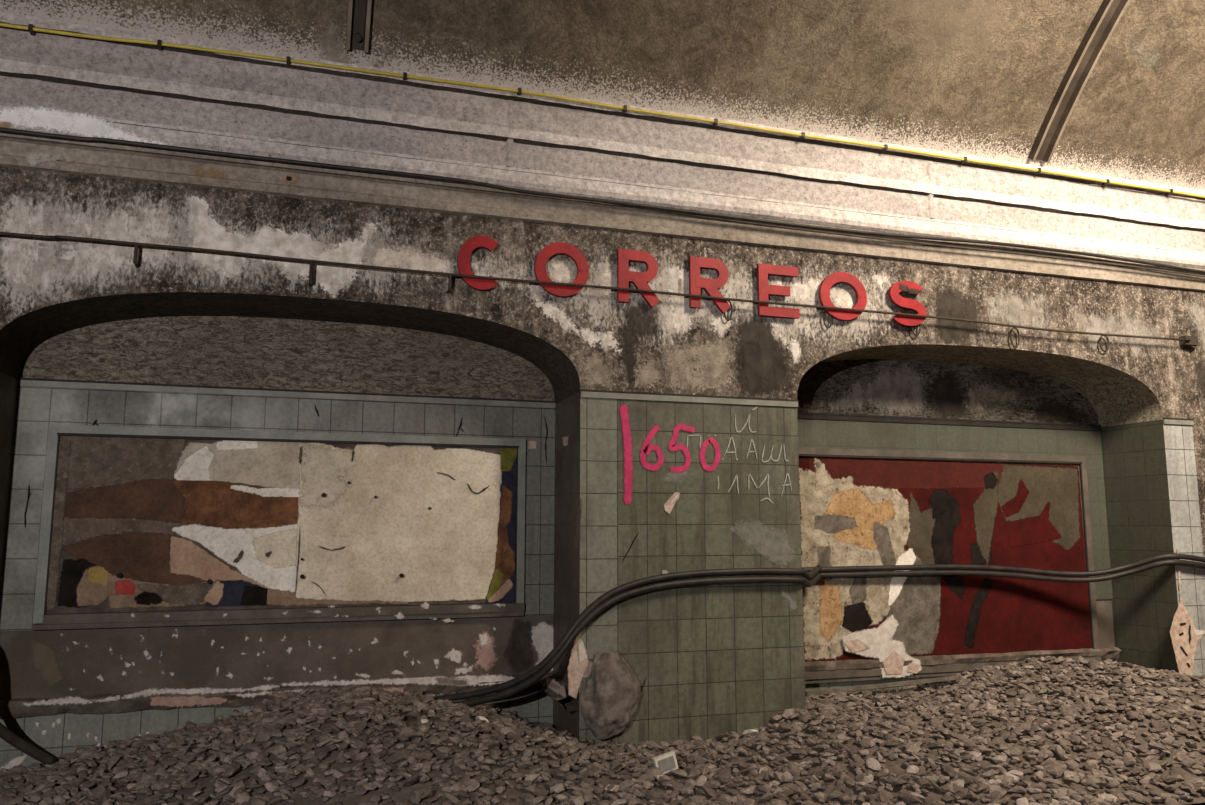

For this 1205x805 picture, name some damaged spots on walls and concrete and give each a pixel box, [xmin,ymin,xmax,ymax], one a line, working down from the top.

leakage [0,184,895,396]
leakage [935,289,1047,343]
leakage [821,364,1024,418]
leakage [1036,400,1088,423]
spalling [1170,548,1205,675]
peeling [23,627,513,739]
spalling [531,622,592,698]